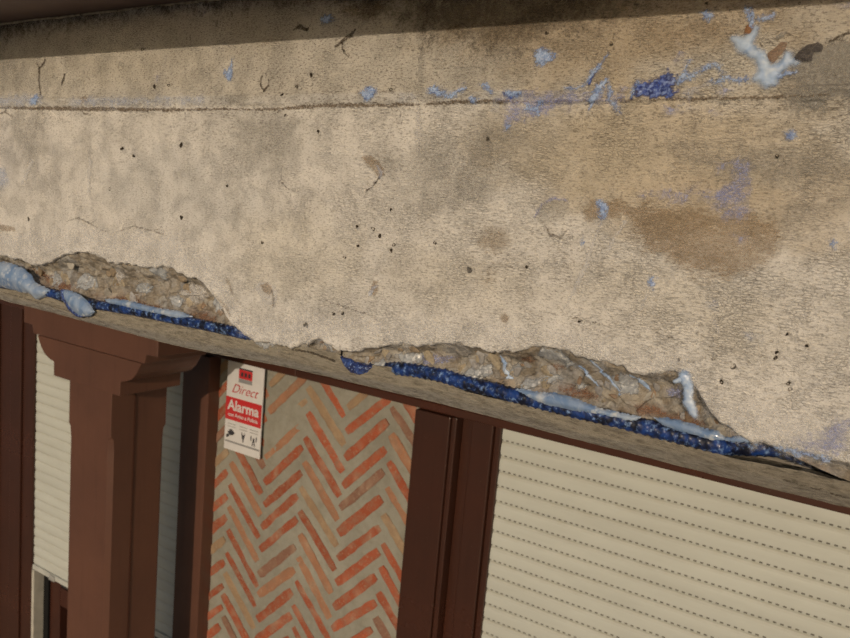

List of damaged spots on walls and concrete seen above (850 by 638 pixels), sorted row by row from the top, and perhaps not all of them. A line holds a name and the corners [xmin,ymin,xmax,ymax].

spalling [0,252,234,326]
spalling [309,339,741,437]
spalling [758,441,850,481]